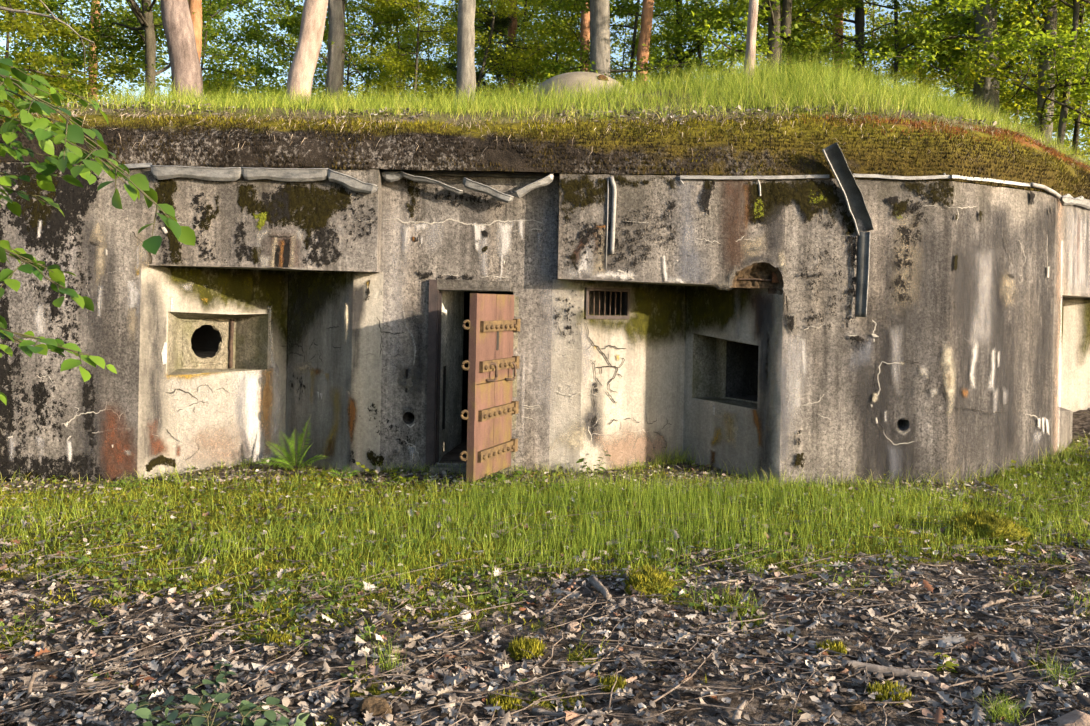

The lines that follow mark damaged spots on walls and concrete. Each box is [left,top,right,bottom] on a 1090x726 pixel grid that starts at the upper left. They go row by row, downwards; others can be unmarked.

corrosion [271,237,297,267]
water stain [596,270,634,280]
water stain [663,210,705,283]
water stain [860,201,1090,483]
corrosion [104,409,134,478]
crack [62,385,233,461]
corrosion [261,370,273,441]
corrosion [326,391,356,463]
crack [522,323,671,457]